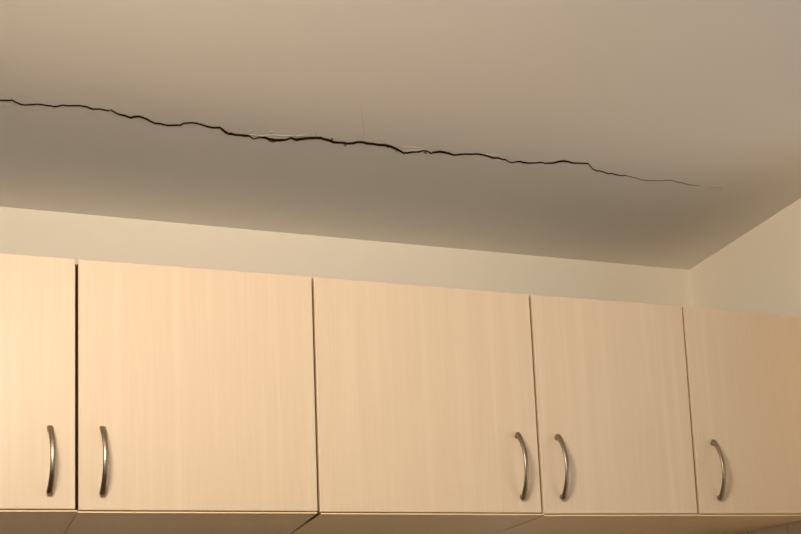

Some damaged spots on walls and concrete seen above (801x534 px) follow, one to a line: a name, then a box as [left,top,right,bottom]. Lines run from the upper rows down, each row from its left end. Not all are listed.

crack [0,99,722,188]